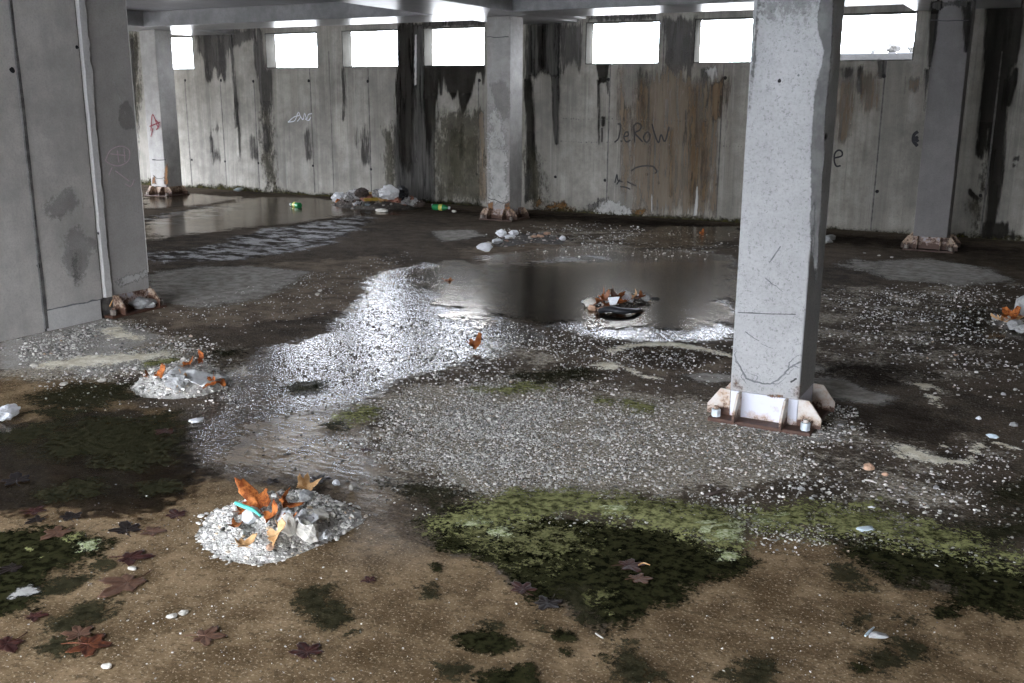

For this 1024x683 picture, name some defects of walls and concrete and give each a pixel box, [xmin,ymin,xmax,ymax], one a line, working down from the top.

damp [186,28,333,197]
damp [356,129,370,165]
damp [382,20,486,216]
damp [522,13,741,231]
rust [617,65,730,217]
damp [953,0,1024,253]
crack [734,351,801,385]